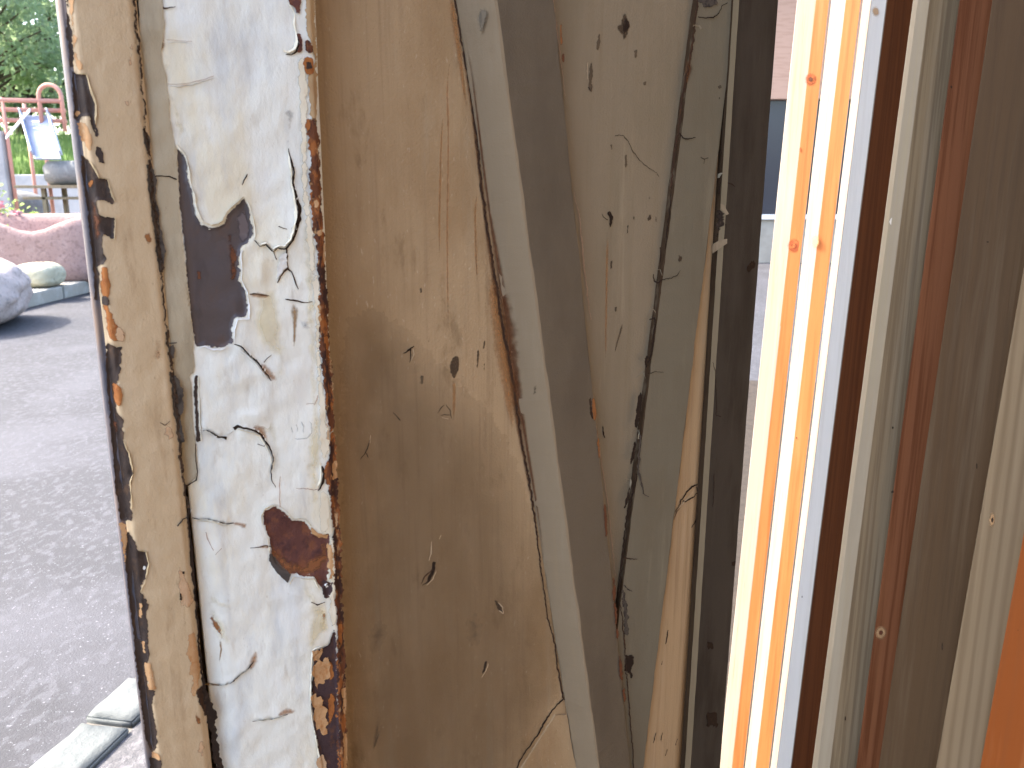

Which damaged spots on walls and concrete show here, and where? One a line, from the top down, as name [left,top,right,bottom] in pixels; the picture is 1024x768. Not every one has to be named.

peeling [65,0,116,300]
peeling [105,343,162,768]
crack [133,0,276,768]
peeling [176,144,256,350]
crack [250,149,302,297]
peeling [283,1,299,55]
corrosion [261,0,348,768]
peeling [309,275,341,768]
crack [452,0,565,768]
crack [615,0,728,374]
crack [674,477,715,527]
crack [747,261,755,272]